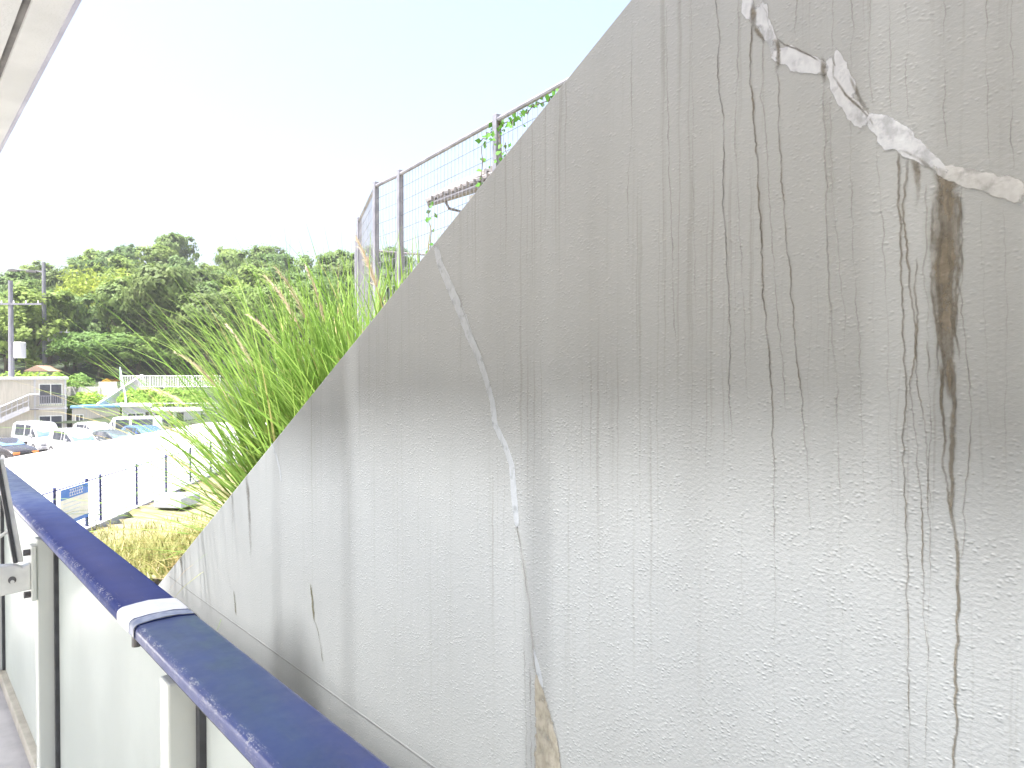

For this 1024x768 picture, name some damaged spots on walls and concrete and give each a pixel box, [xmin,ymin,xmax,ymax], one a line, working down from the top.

crack [434,244,519,537]
leakage [757,181,766,314]
crack [741,0,1024,203]
corrosion [897,158,922,462]
corrosion [906,486,928,586]
corrosion [931,174,971,768]